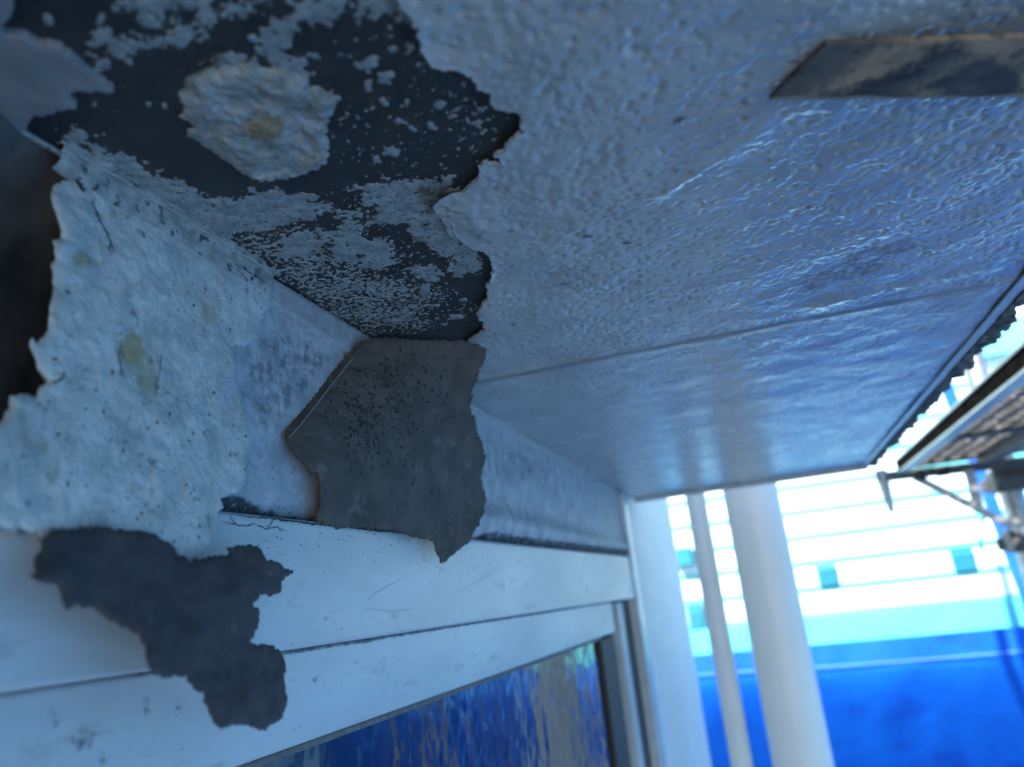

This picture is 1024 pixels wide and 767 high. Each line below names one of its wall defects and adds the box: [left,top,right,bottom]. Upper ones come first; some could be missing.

peeling [0,0,521,731]